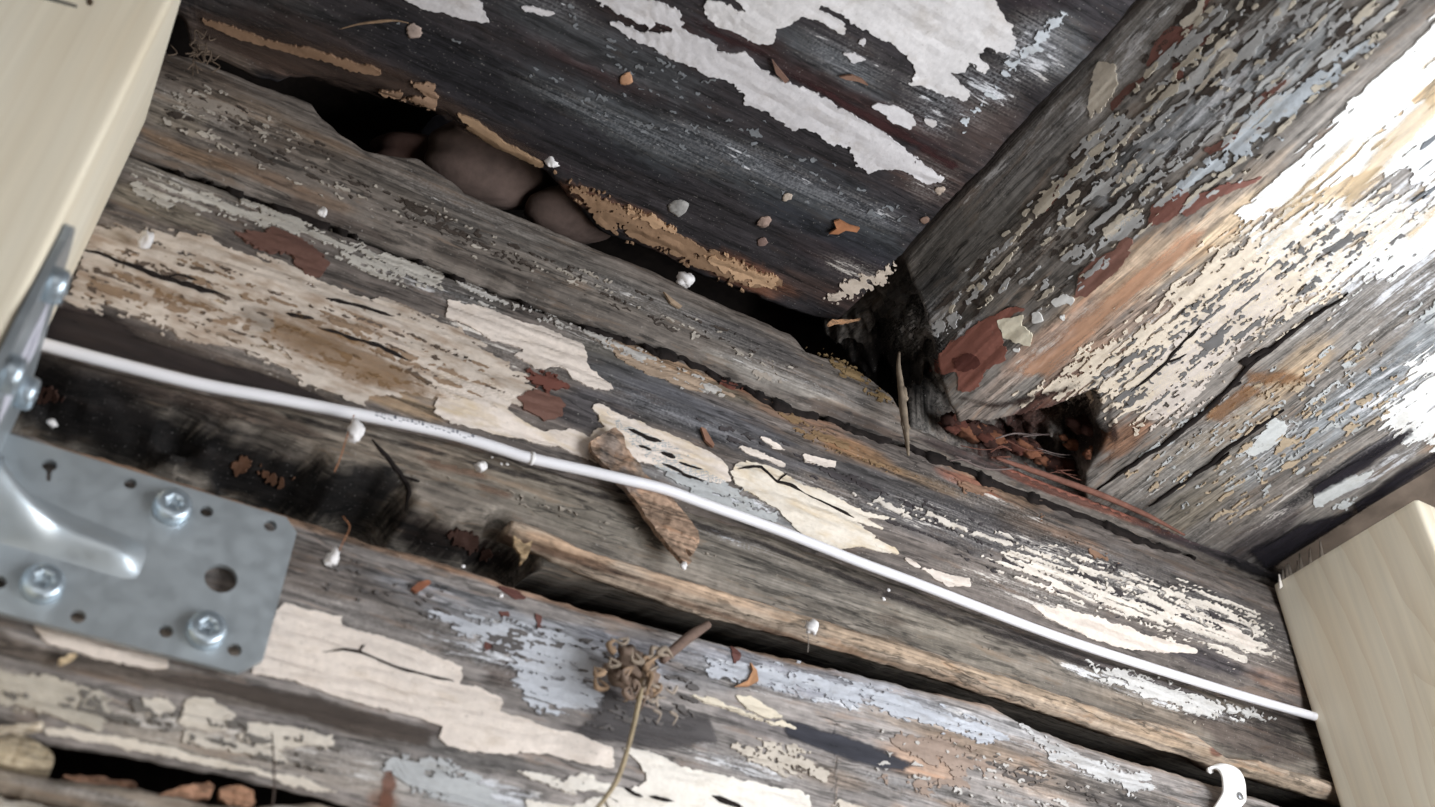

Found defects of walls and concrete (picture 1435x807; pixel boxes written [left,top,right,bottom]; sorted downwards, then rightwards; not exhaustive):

peeling [405,0,489,23]
peeling [162,84,308,185]
peeling [319,158,378,210]
peeling [521,0,1072,222]
peeling [921,0,1435,525]
crack [167,169,1348,561]
peeling [63,172,1277,670]
peeling [34,613,169,670]
peeling [252,603,1154,807]
peeling [1085,659,1277,726]
crack [623,787,674,802]
crack [712,795,742,807]